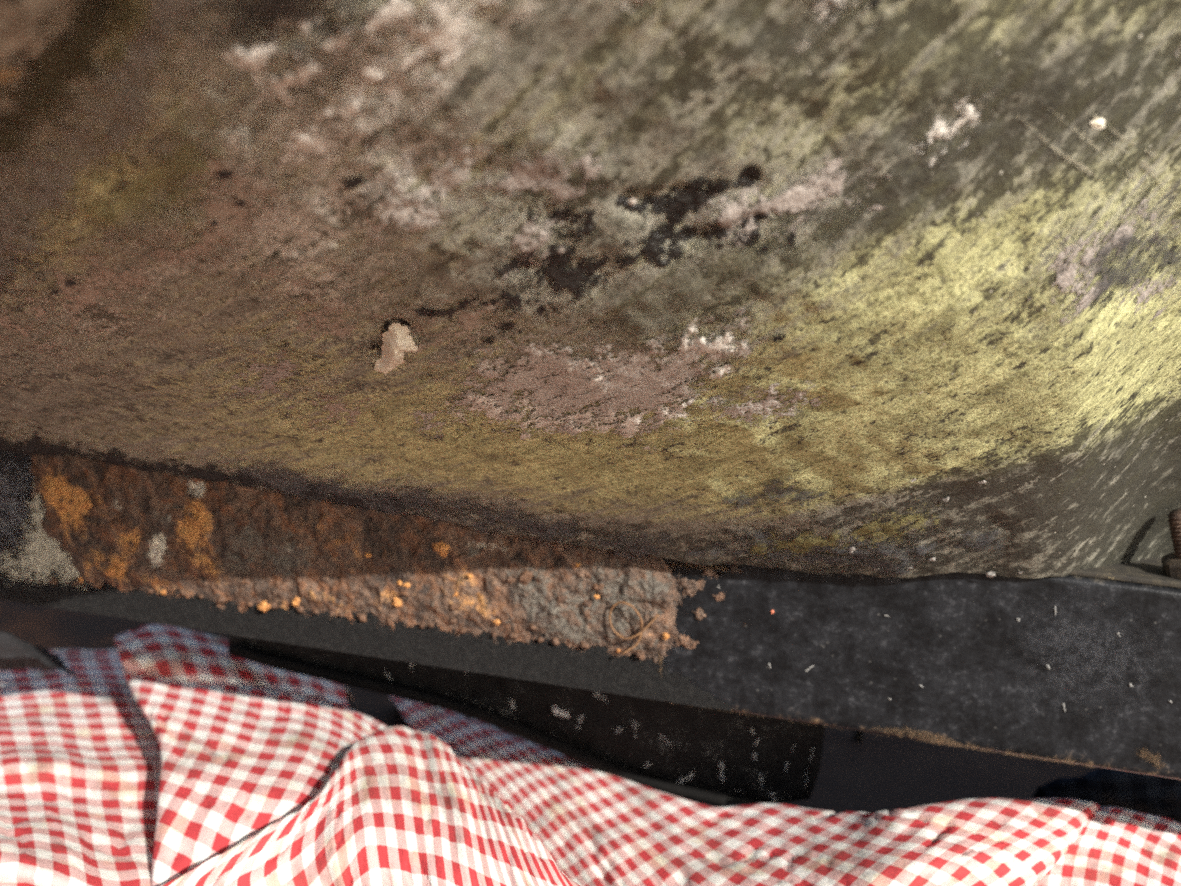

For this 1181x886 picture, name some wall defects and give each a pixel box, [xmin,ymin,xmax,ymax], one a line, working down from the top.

damp [1018,116,1093,174]
damp [1049,108,1159,181]
damp [351,123,621,280]
damp [685,153,886,247]
corrosion [29,455,742,663]
damp [232,457,672,563]
damp [724,476,831,513]
damp [686,526,1005,580]